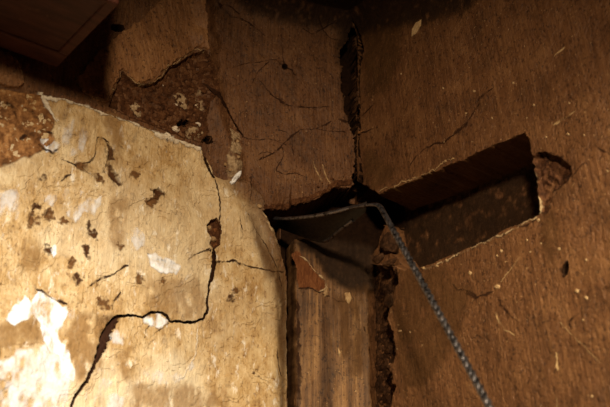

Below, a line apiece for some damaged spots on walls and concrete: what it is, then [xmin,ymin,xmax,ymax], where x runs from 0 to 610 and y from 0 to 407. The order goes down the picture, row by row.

peeling [0,0,220,167]
crack [202,20,378,194]
crack [61,137,109,181]
spalling [95,143,121,186]
crack [199,146,221,221]
spalling [224,128,242,184]
flaking render [257,177,353,231]
spalling [532,151,572,222]
peeling [292,251,328,297]
crack [70,248,283,407]
flaking render [371,264,411,407]